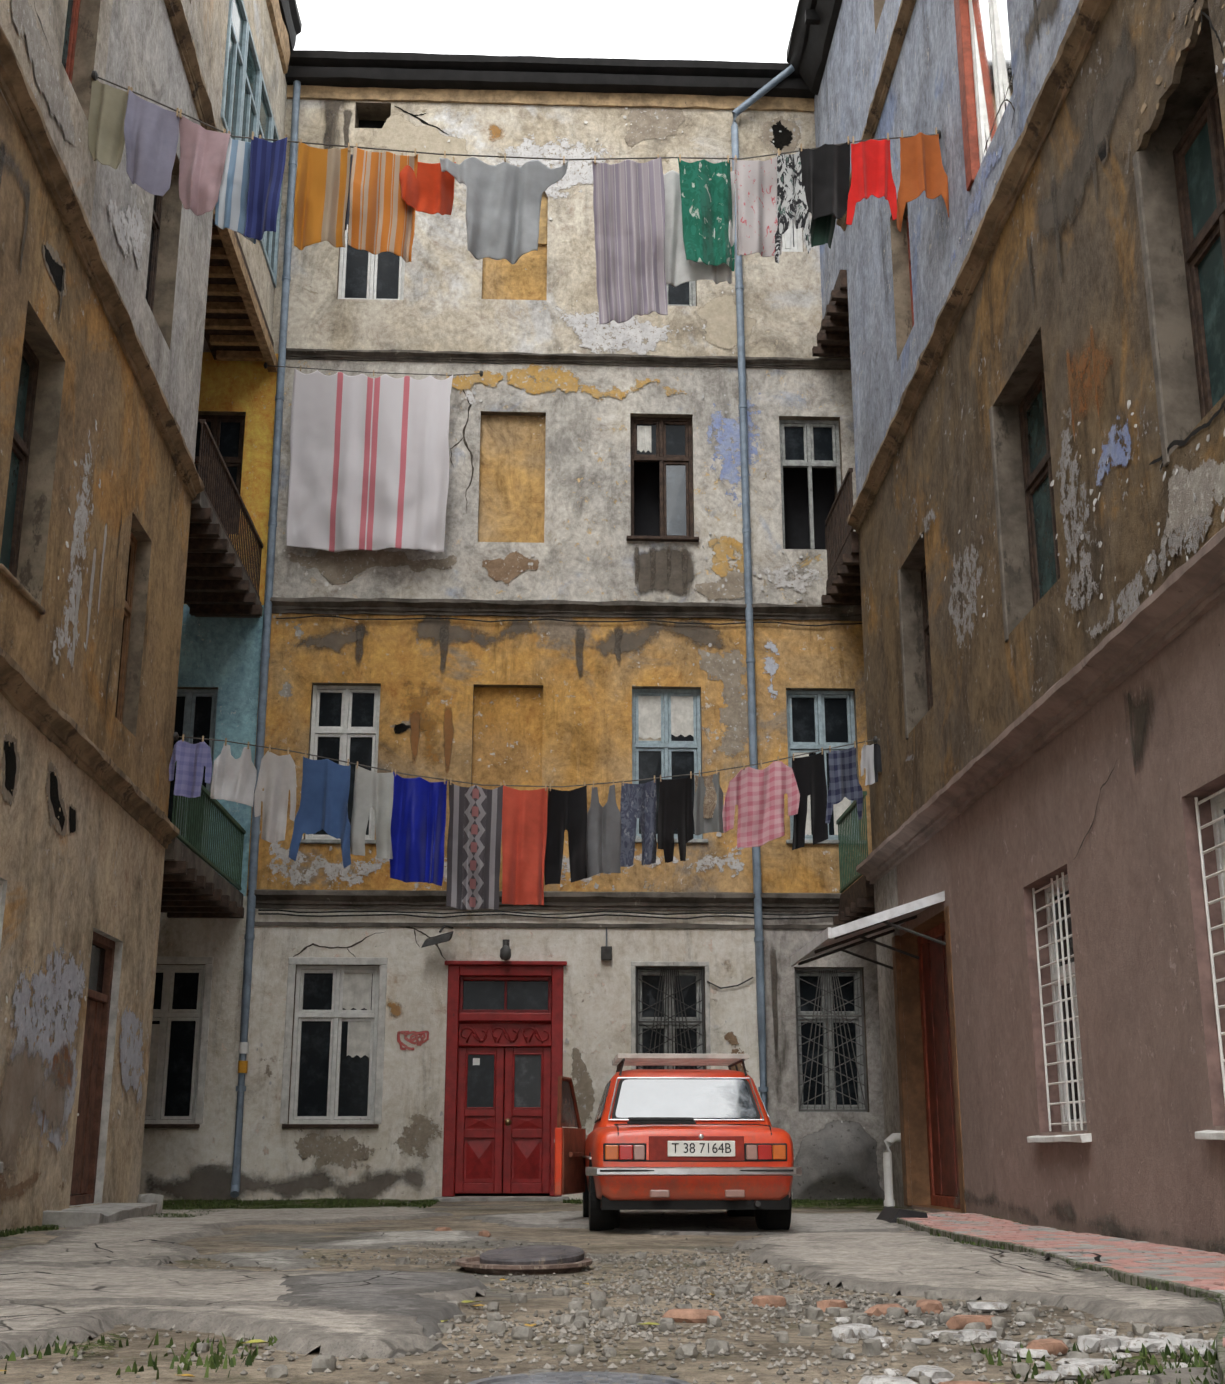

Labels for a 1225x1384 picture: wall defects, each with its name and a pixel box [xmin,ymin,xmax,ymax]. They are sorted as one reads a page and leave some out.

crack [1193,0,1224,56]
peeling [495,133,612,200]
peeling [552,289,756,355]
peeling [447,364,764,507]
peeling [50,419,107,678]
peeling [944,497,985,649]
peeling [1050,400,1225,639]
leakage [298,624,368,665]
leakage [414,615,531,672]
leakage [576,619,723,677]
peeling [4,941,86,1152]
leakage [146,1165,424,1200]